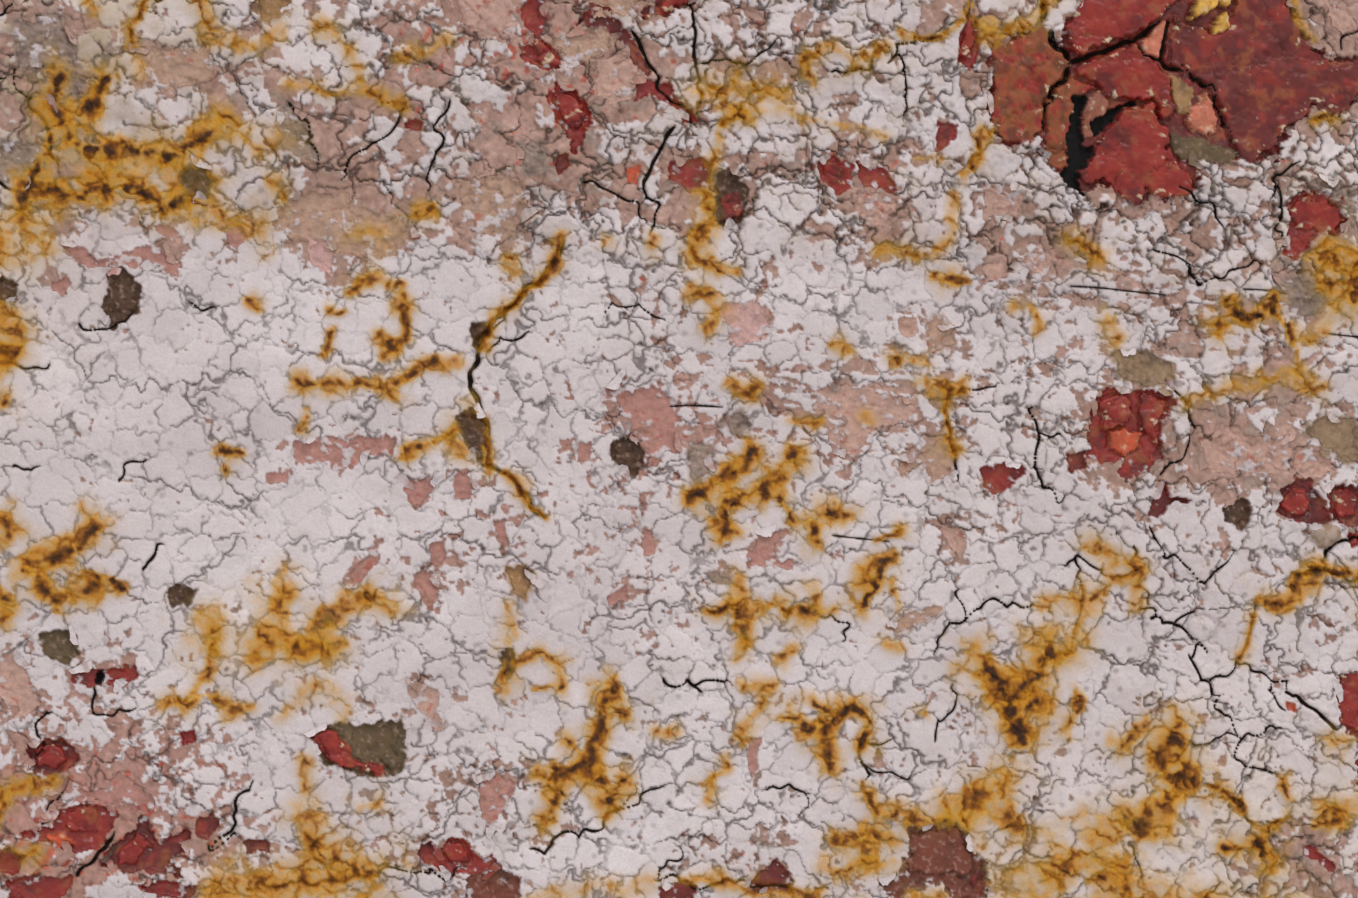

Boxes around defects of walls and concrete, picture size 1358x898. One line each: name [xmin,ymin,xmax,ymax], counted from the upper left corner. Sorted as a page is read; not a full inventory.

crack [583,4,781,234]
peeling [958,0,1358,206]
crack [1153,161,1300,294]
rust [0,502,129,628]
peeling [304,678,444,777]
rust [291,271,464,433]
rust [681,438,855,550]
crack [934,555,1106,653]
rust [957,540,1148,753]
peeling [1066,348,1192,518]
crack [1133,527,1341,773]
peeling [0,735,219,898]